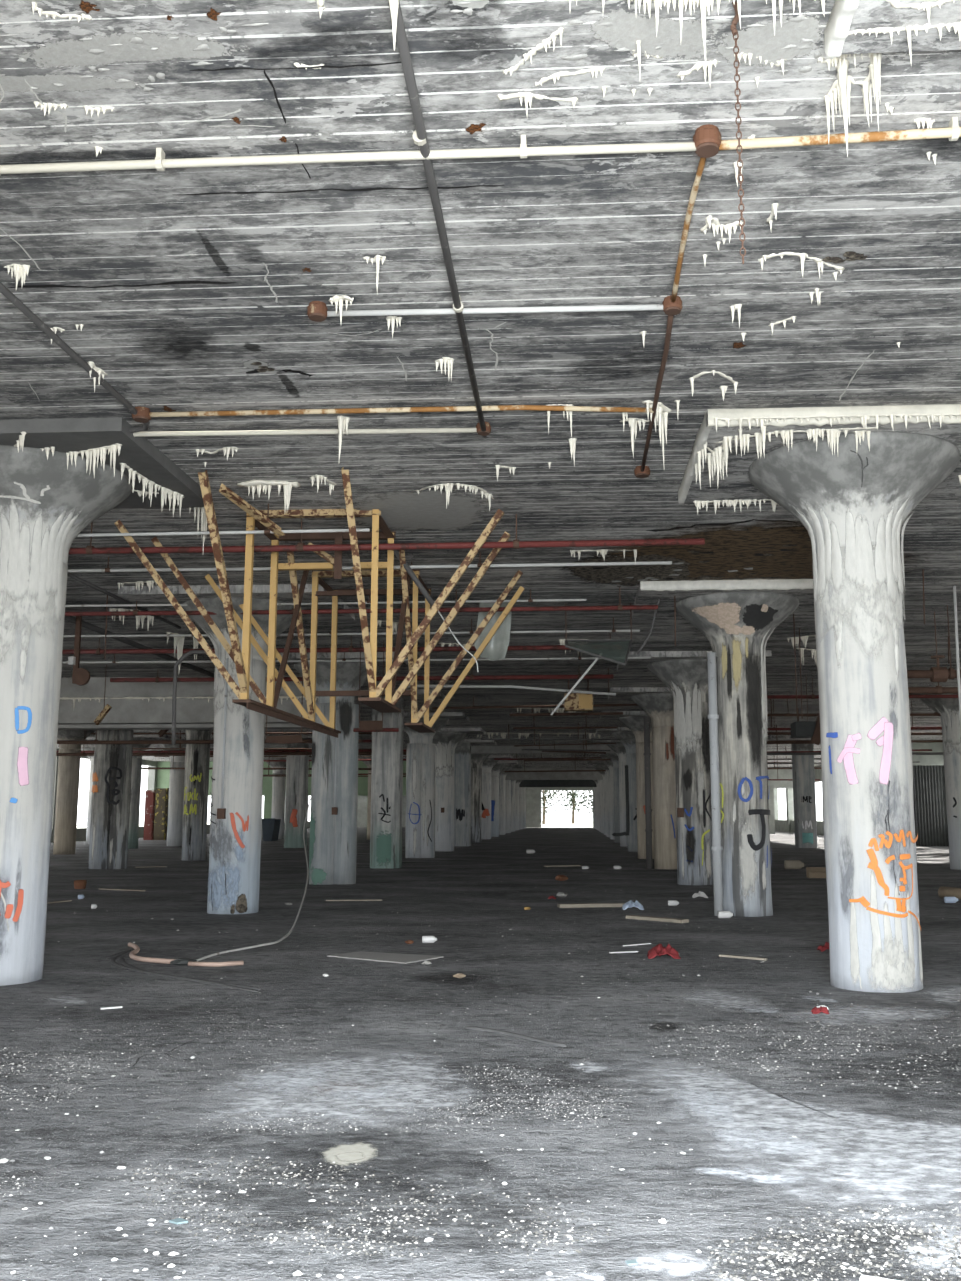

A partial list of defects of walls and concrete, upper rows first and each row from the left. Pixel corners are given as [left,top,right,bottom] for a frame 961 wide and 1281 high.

peeling [0,23,269,92]
water stain [428,0,500,54]
water stain [502,28,564,75]
water stain [497,67,607,115]
peeling [561,3,828,79]
water stain [734,52,787,87]
water stain [766,0,961,157]
spalling [646,519,800,532]
spalling [560,551,713,587]
water stain [570,370,961,764]
peeling [692,602,755,635]
water stain [218,1053,532,1242]